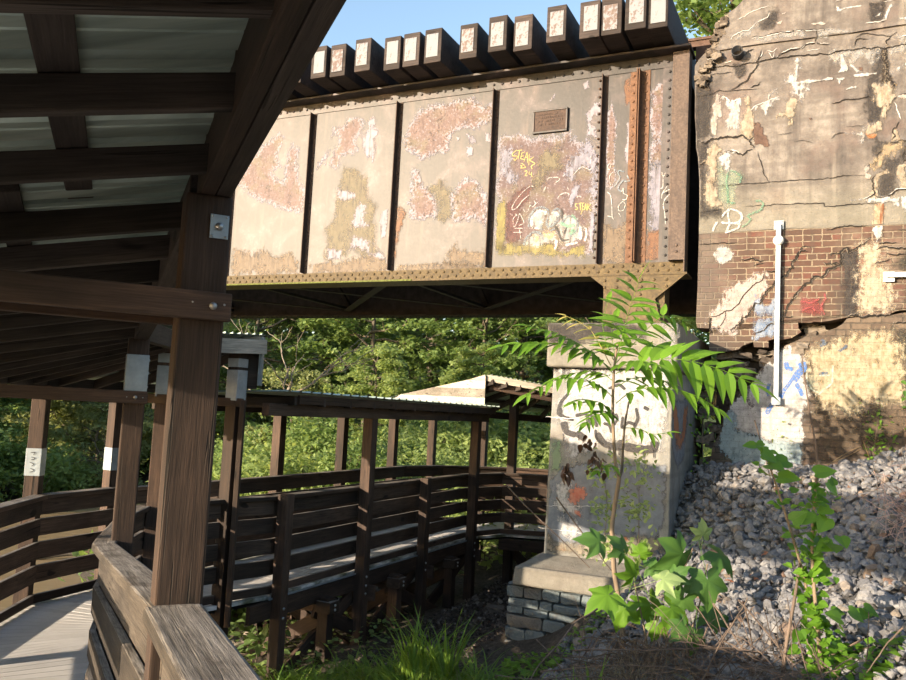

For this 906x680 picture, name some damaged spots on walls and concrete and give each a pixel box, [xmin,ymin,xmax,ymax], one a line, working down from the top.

spalling [694,14,729,93]
crack [702,1,906,110]
spalling [879,49,897,88]
peeling [230,96,629,276]
spalling [753,122,770,147]
crack [698,93,906,333]